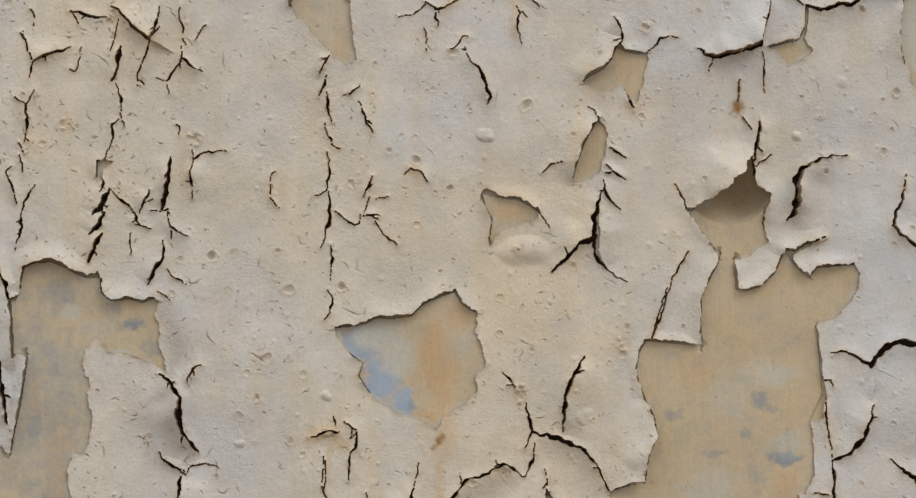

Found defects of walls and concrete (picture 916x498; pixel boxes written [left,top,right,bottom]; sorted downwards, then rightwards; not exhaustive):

peeling [282,0,357,65]
peeling [577,35,650,101]
crack [0,8,82,299]
crack [70,5,227,301]
crack [313,54,397,320]
peeling [478,186,540,245]
peeling [0,245,166,498]
crack [153,364,217,498]
peeling [334,281,486,430]
crack [451,356,610,498]
peeling [610,153,860,498]
crack [831,328,916,369]